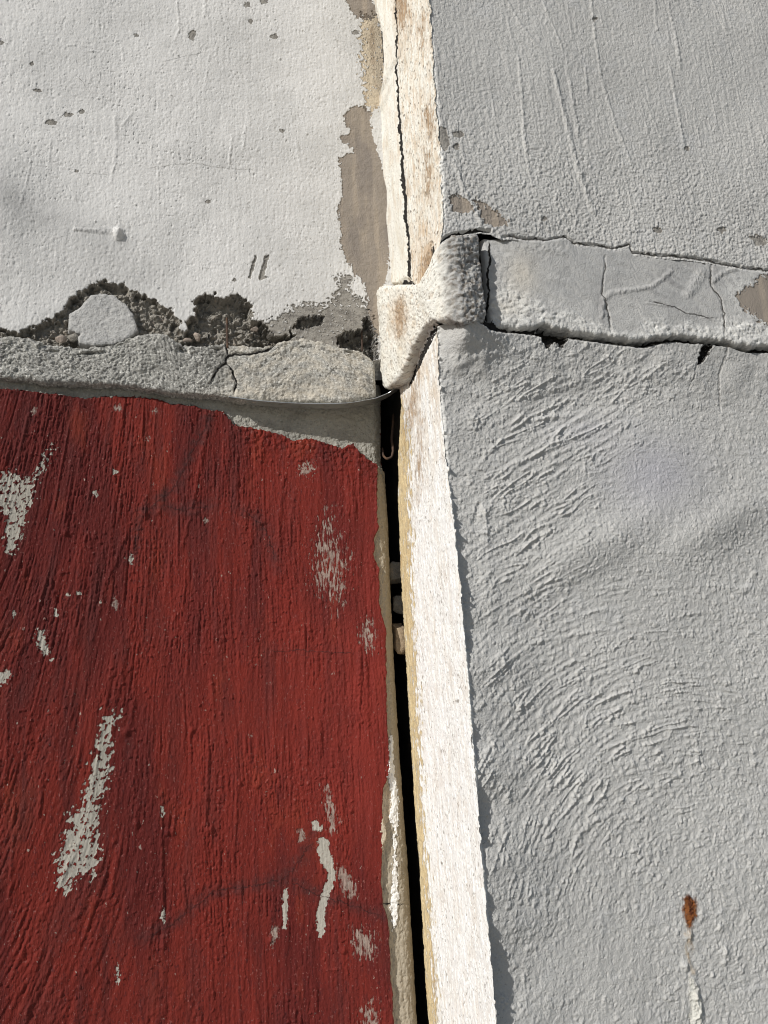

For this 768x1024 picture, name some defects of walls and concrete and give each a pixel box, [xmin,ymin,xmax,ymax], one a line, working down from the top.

peeling [0,0,391,362]
crack [394,0,415,285]
crack [211,344,276,391]
crack [440,228,768,400]
peeling [735,274,768,325]
peeling [0,381,384,479]
peeling [0,442,58,555]
peeling [309,509,354,616]
peeling [51,707,124,897]
peeling [270,888,289,946]
peeling [298,784,358,938]
rust [682,895,697,927]